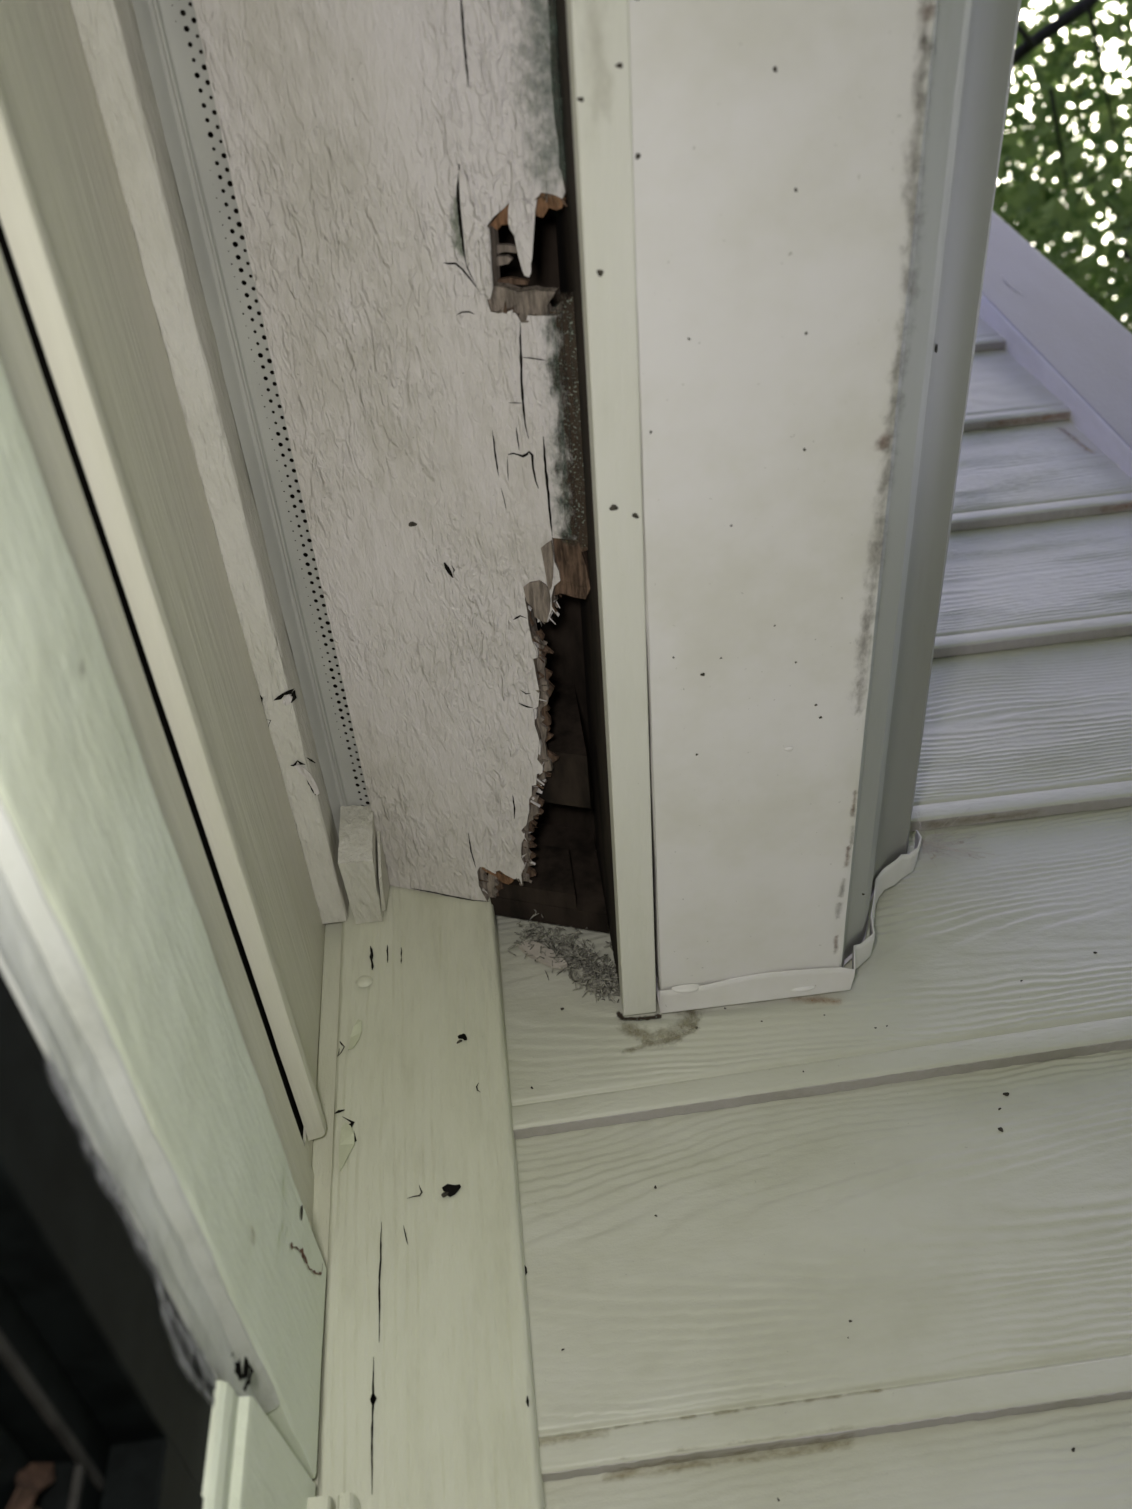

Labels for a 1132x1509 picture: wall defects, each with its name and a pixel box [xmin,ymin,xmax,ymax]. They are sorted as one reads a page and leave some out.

crack [460,0,468,88]
crack [443,164,479,315]
crack [492,322,552,532]
damp [549,294,588,547]
damp [616,1011,661,1021]